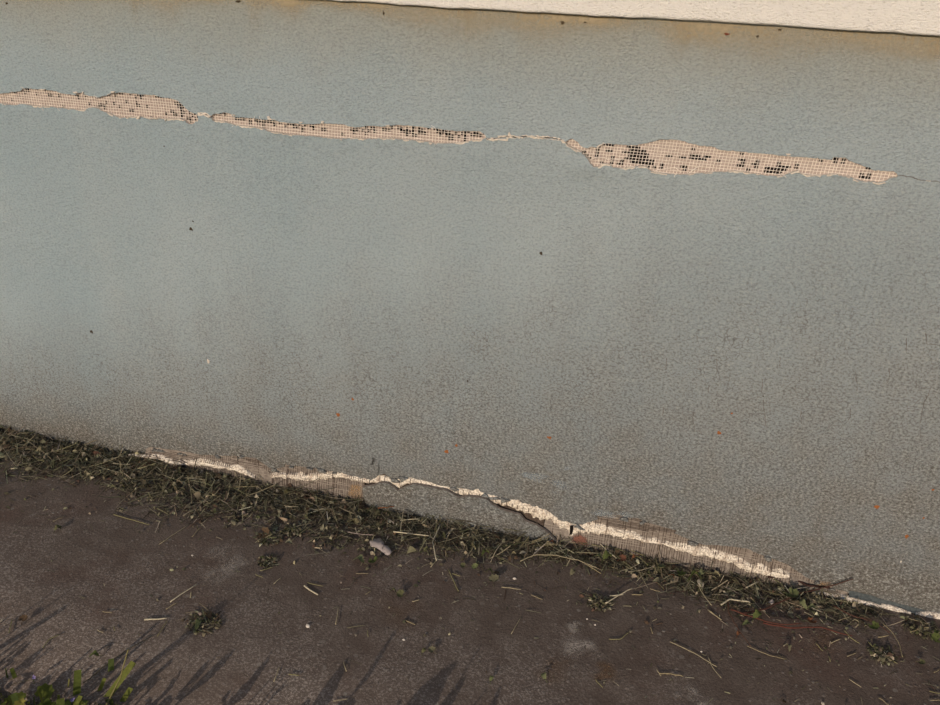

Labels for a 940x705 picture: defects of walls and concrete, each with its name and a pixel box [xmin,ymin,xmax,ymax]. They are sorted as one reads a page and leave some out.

flaking render [0,87,486,145]
flaking render [566,139,897,185]
spalling [120,447,926,613]